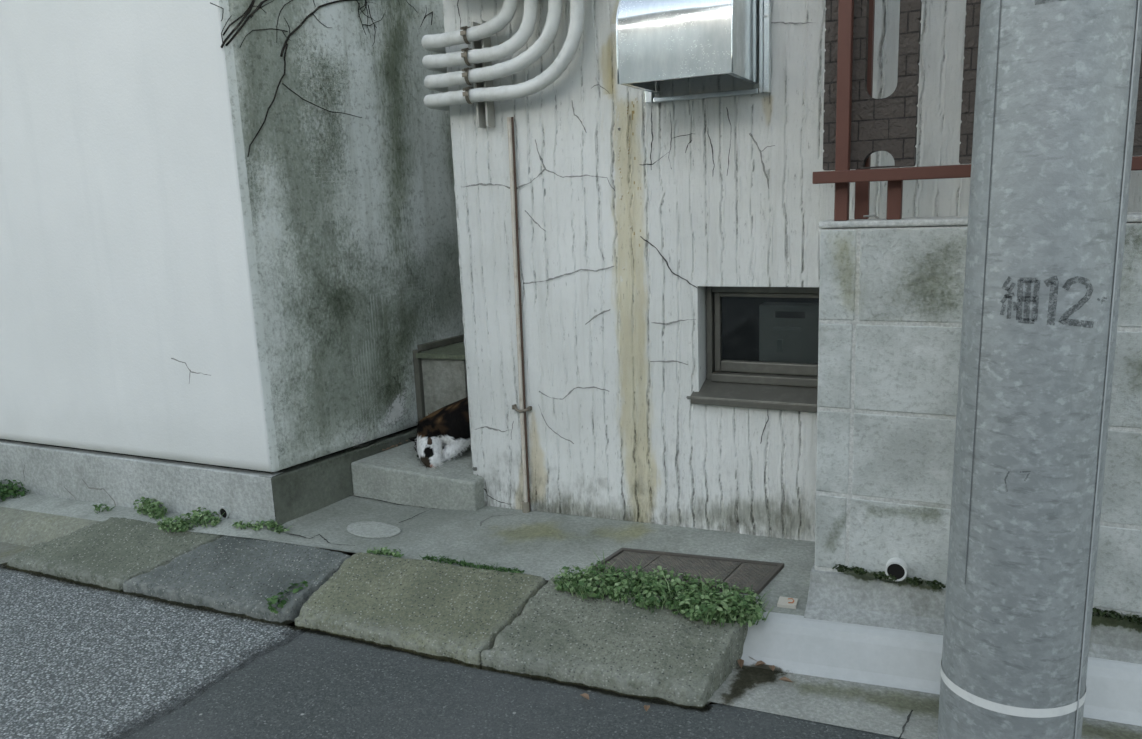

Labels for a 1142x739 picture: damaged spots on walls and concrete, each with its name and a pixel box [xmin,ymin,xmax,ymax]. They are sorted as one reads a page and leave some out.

crack [572,84,610,133]
crack [639,107,775,189]
crack [465,139,615,231]
crack [523,266,615,284]
crack [640,236,698,289]
crack [651,318,696,326]
damp [352,346,408,444]
crack [538,386,609,444]